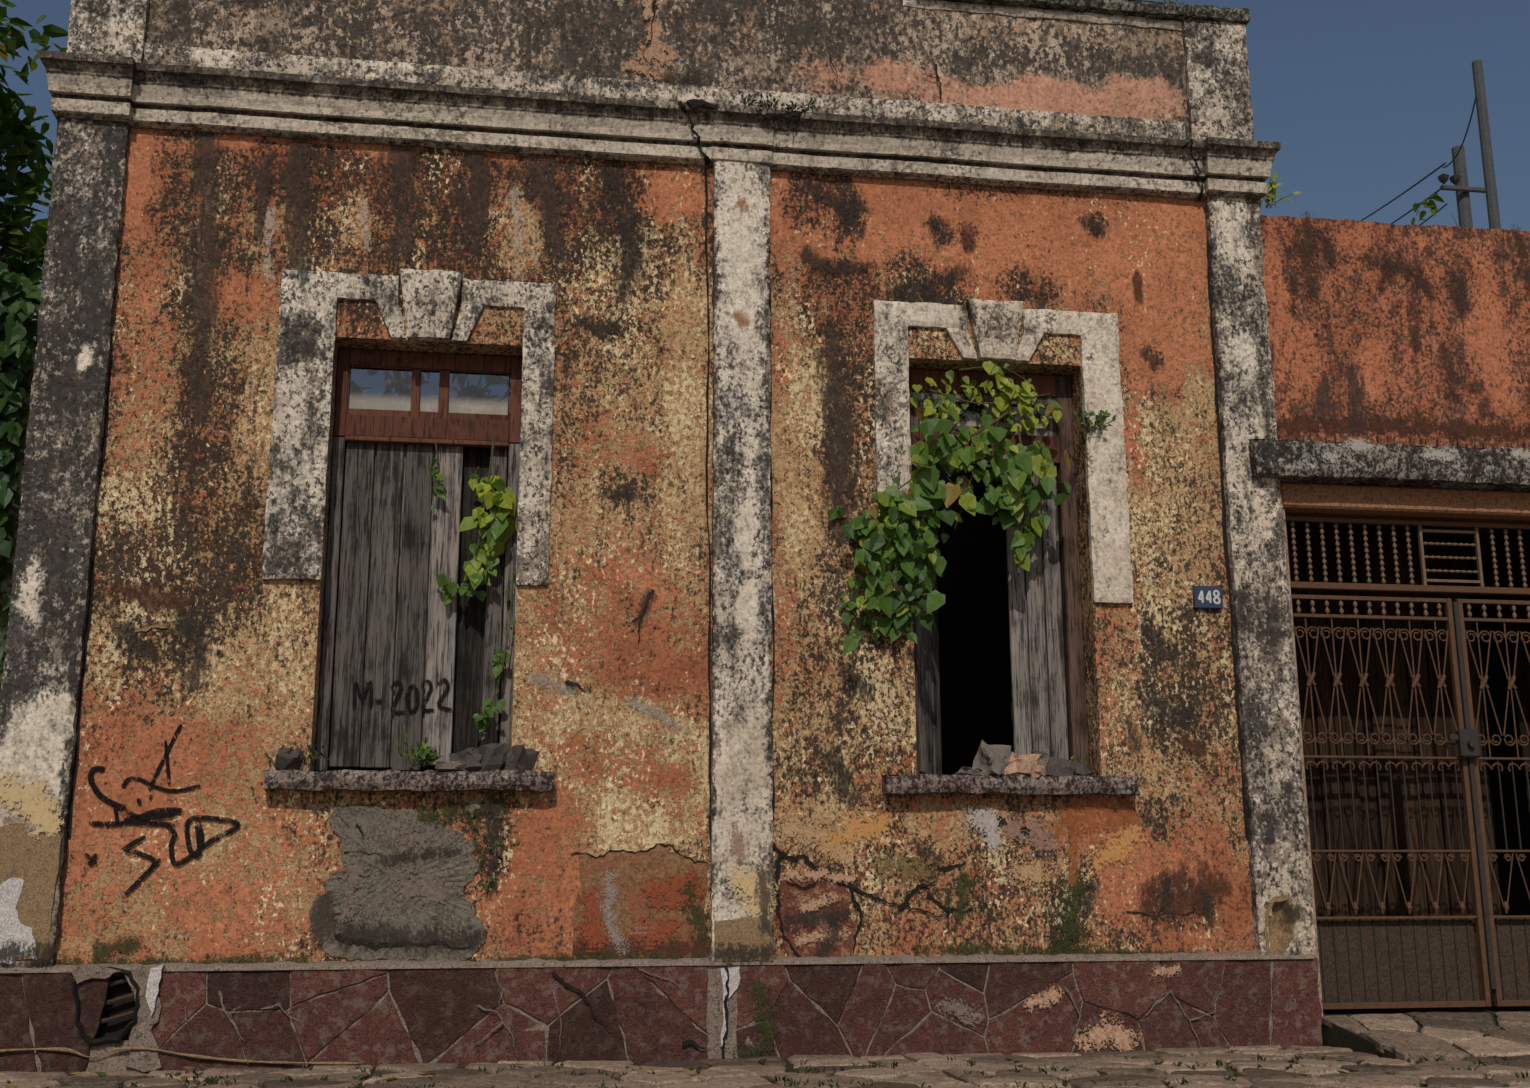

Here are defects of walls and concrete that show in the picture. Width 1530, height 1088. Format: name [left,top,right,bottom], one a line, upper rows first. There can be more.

leakage [183,131,227,425]
leakage [255,138,319,271]
leakage [800,244,877,280]
leakage [886,219,976,305]
leakage [1276,246,1530,442]
crack [674,101,712,862]
crack [768,256,776,835]
flaking render [0,769,64,966]
flaking render [571,823,954,966]
crack [903,856,974,912]
spalling [69,964,164,1073]
crack [682,965,729,1059]